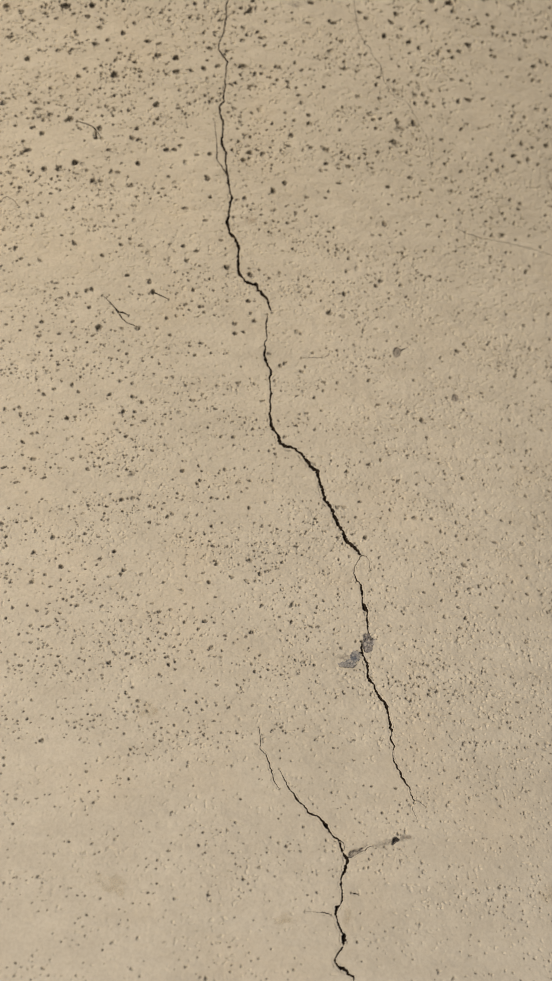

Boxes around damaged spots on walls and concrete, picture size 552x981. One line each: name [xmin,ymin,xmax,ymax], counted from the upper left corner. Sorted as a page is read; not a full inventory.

crack [213,0,427,821]
crack [257,728,373,981]